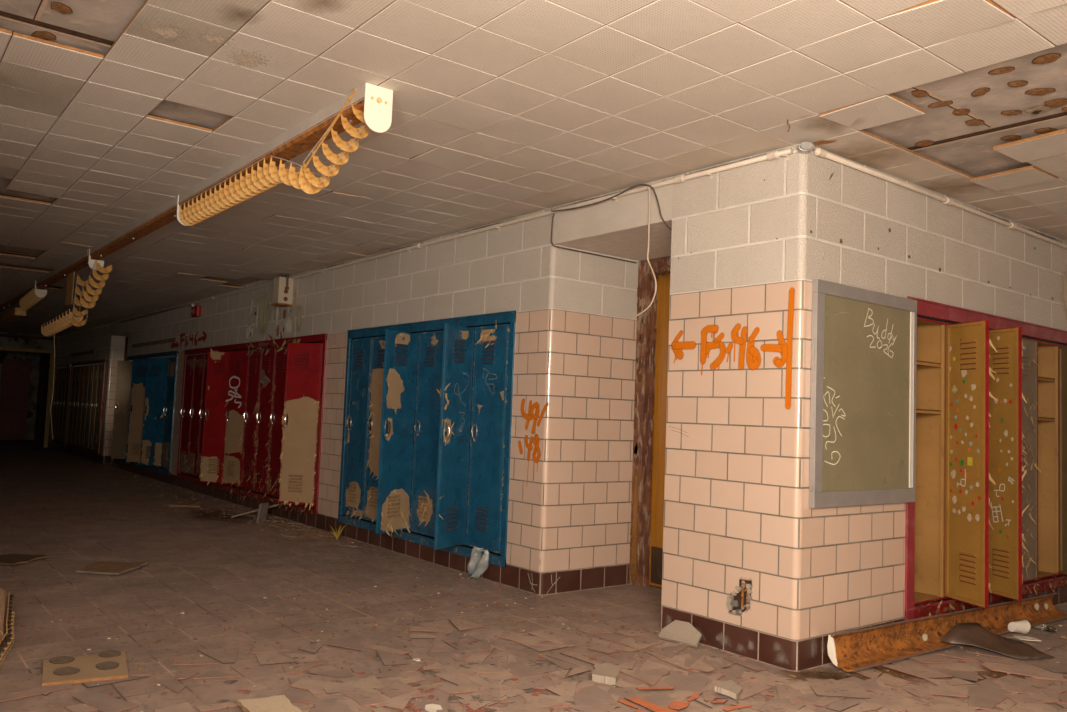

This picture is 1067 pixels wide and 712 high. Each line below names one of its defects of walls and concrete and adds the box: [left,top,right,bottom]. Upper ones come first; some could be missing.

peeling [0,0,187,55]
peeling [149,99,231,129]
peeling [863,43,1067,177]
spalling [726,579,753,616]